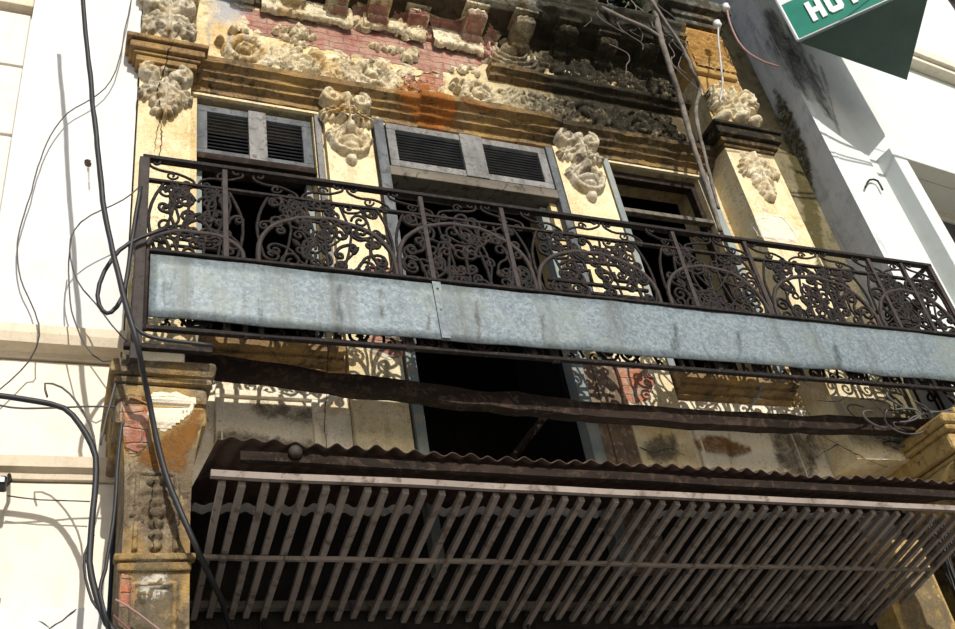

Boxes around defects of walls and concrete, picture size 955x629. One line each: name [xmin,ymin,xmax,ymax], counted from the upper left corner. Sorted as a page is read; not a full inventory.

crack [154,33,179,156]
flaking render [233,0,501,92]
corrosion [397,82,492,141]
damp [766,11,831,118]
flaking render [597,356,660,405]
flaking render [117,391,196,457]
damp [647,435,678,464]
flaking render [117,571,139,611]
damp [901,535,952,629]